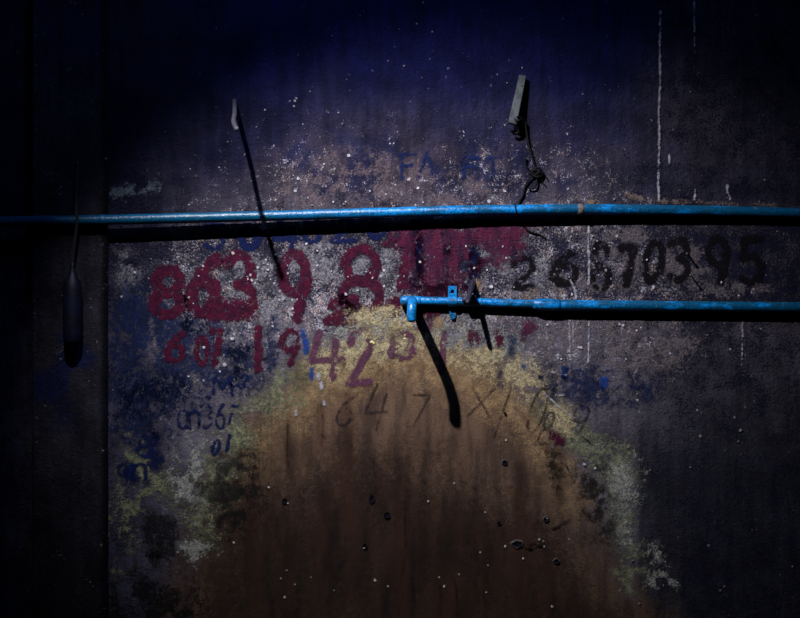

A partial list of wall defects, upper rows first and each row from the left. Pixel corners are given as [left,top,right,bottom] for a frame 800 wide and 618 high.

leakage [108,314,680,618]